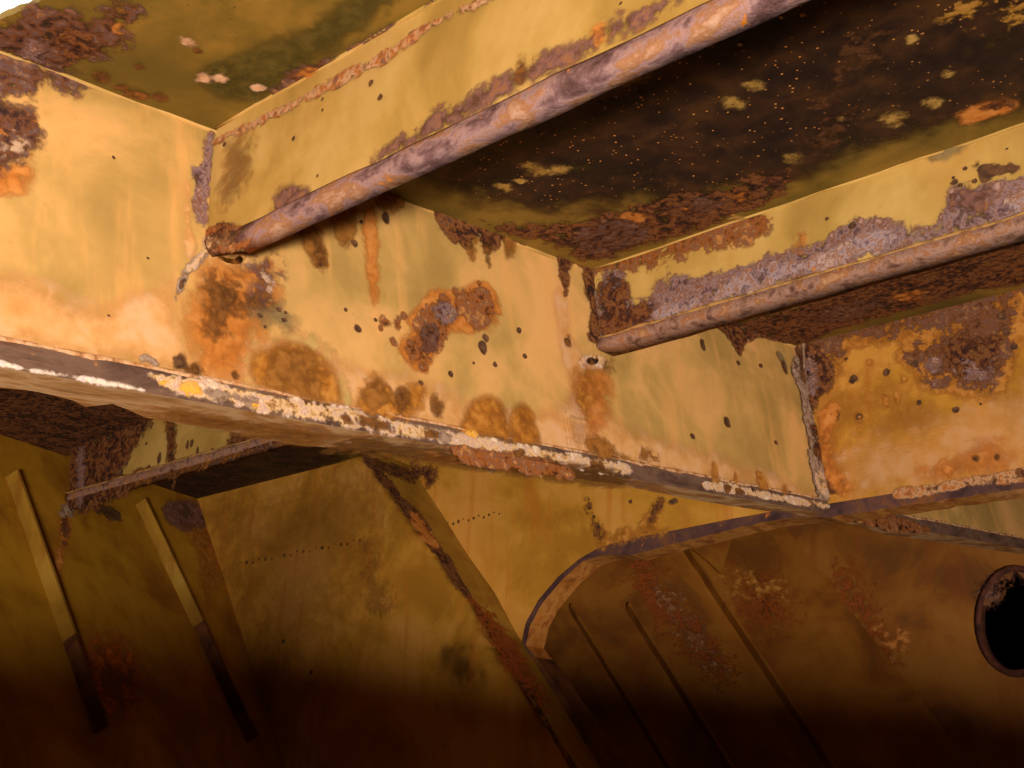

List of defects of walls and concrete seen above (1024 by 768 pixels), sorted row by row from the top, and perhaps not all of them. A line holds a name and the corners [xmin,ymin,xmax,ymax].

rust [0,0,147,196]
water stain [202,0,392,101]
rust [370,0,682,164]
rust [173,0,501,423]
rust [434,168,1024,343]
rust [0,361,678,768]
peeling [139,354,632,475]
hole [473,334,497,367]
peeling [701,481,830,509]
rust [719,244,1024,502]
peeling [893,468,1024,499]